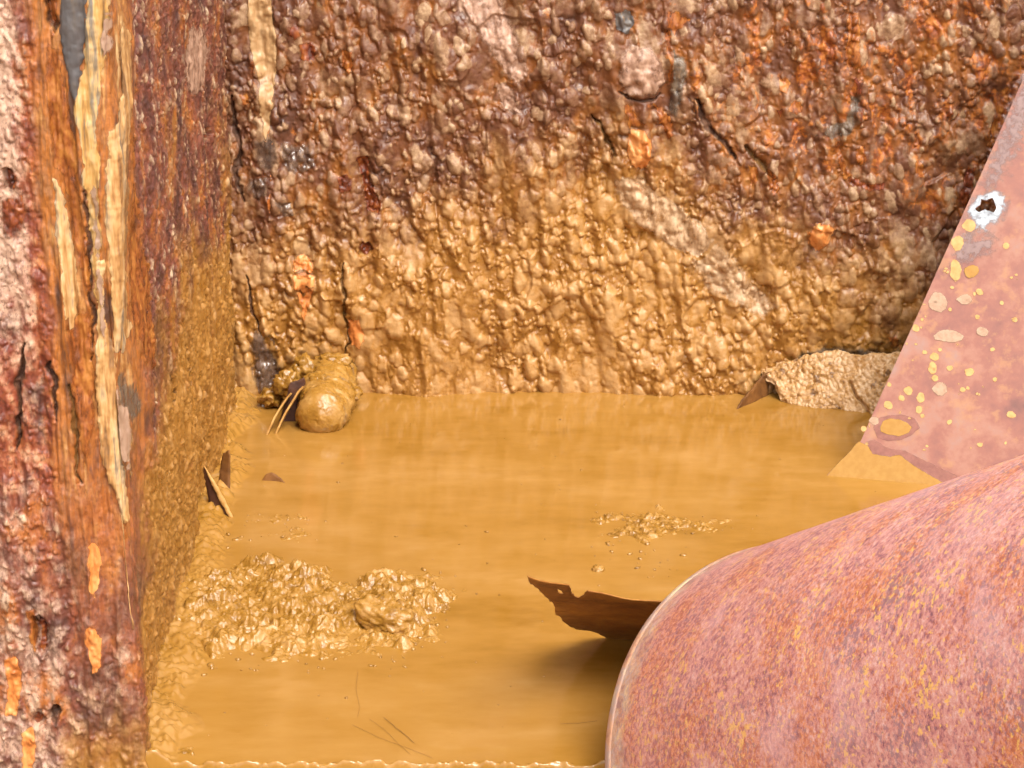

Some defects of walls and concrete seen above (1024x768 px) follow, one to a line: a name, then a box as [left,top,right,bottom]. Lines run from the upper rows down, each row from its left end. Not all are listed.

spalling [59,0,87,100]
rust [45,0,92,291]
crack [696,99,767,173]
rust [989,87,1009,149]
rust [958,167,976,211]
rust [129,116,157,371]
crack [14,343,83,483]
rust [64,311,95,466]
rust [87,543,102,598]
rust [4,656,22,716]
rust [85,627,102,674]
rust [21,727,36,768]